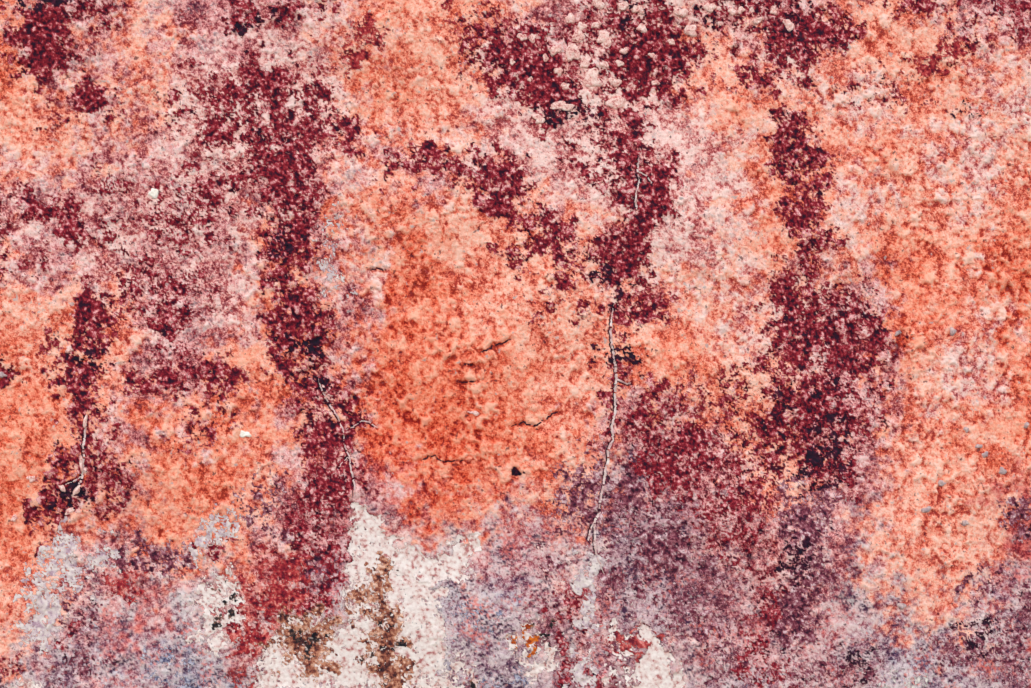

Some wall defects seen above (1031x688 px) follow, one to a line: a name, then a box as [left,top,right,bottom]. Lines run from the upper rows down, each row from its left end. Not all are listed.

crack [586,305,632,573]